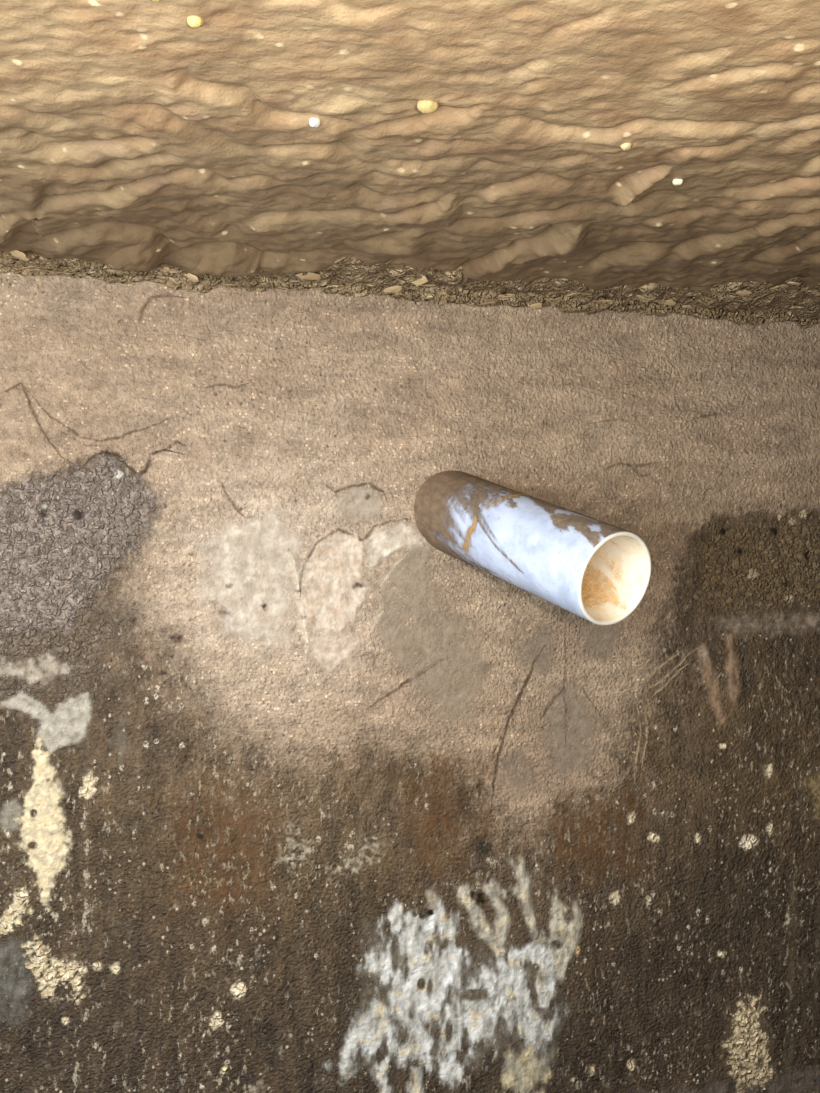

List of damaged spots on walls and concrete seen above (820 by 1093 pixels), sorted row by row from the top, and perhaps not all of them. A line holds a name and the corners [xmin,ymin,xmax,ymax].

crack [4,384,181,475]
water stain [717,612,819,634]
crack [490,646,544,812]
water stain [0,653,91,912]
water stain [276,826,312,866]
water stain [328,837,379,880]
water stain [328,860,582,1093]